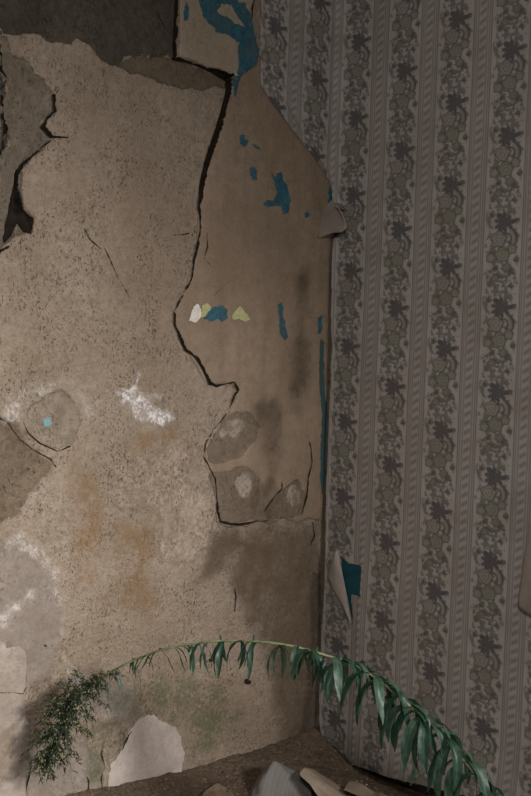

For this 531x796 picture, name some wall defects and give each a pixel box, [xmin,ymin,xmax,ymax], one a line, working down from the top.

peeling [217,3,244,27]
crack [0,45,8,155]
flaking render [0,32,56,250]
crack [10,94,68,214]
flaking render [119,55,244,97]
crack [155,0,283,526]
flaking render [0,390,80,522]
damp [118,380,173,426]
crack [302,442,315,546]
peeling [0,541,185,796]